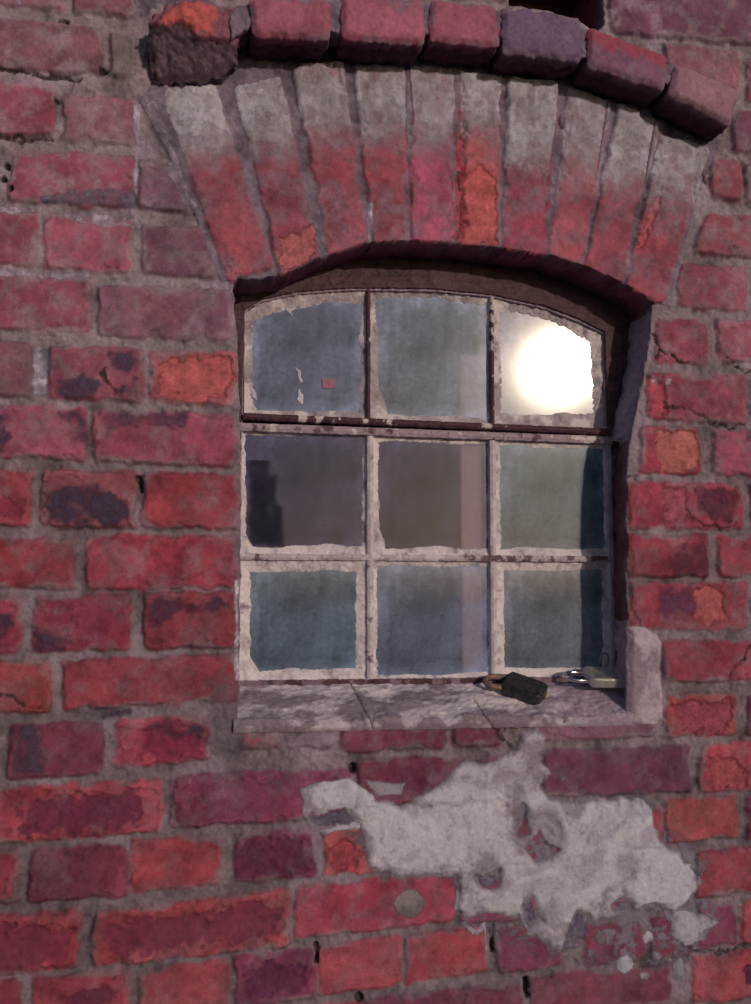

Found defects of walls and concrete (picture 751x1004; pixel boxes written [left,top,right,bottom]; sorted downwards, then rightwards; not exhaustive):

spalling [453,85,499,246]
spalling [278,224,317,272]
crack [651,333,688,364]
crack [667,406,744,430]
crack [0,694,41,709]
peeling [301,730,718,980]